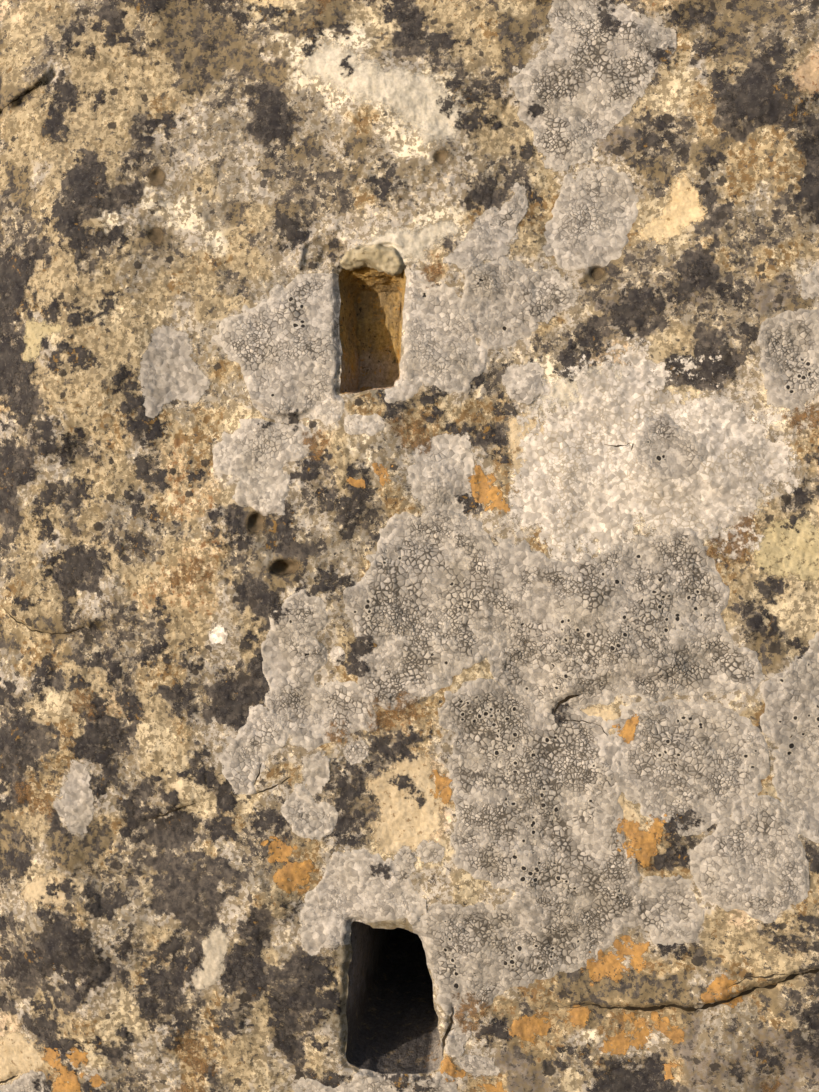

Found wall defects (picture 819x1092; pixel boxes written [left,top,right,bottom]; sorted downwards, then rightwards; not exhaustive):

crack [0,81,41,114]
crack [557,969,819,1012]